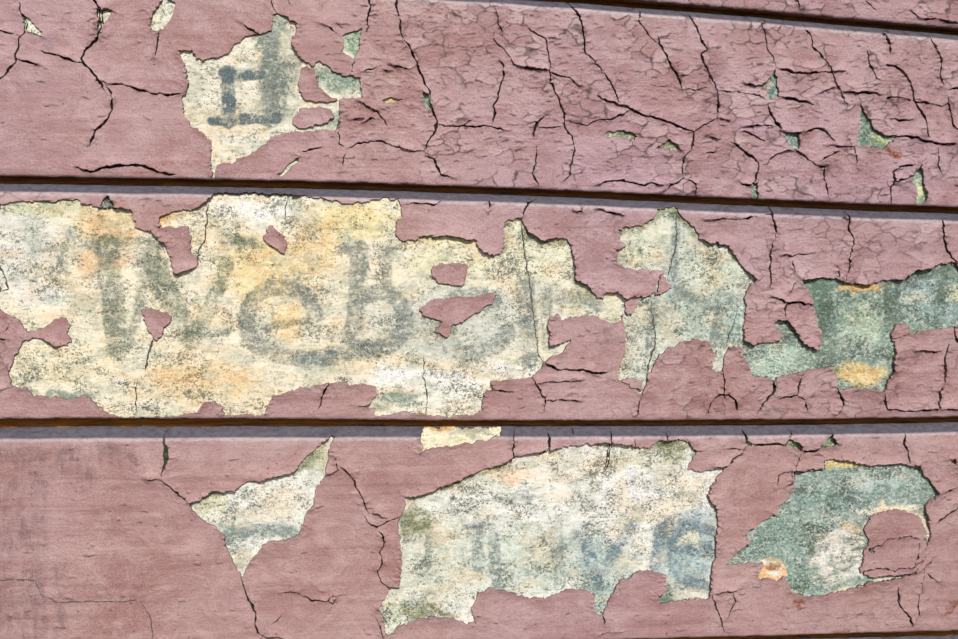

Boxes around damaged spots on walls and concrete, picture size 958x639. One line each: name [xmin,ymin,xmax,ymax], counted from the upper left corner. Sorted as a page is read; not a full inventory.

crack [0,0,178,143]
peeling [179,14,363,178]
crack [78,164,174,176]
crack [302,1,958,402]
peeling [0,192,958,452]
crack [161,431,169,472]
crack [241,576,279,638]
peeling [190,434,334,577]
crack [335,458,400,589]
peeling [378,439,723,635]
crack [758,380,806,411]
peeling [728,459,938,597]